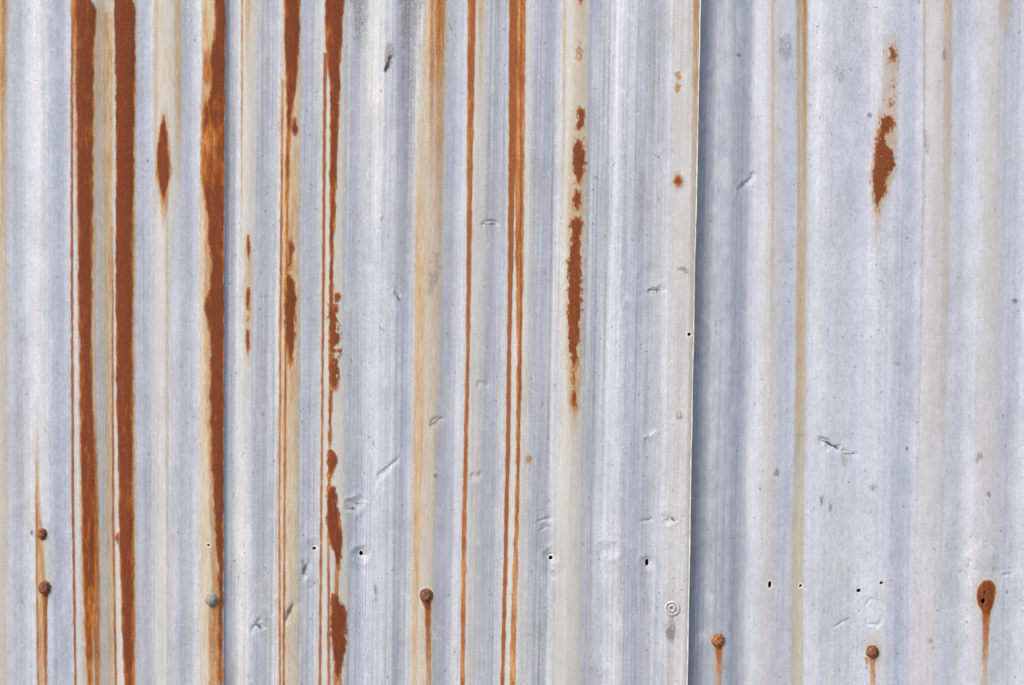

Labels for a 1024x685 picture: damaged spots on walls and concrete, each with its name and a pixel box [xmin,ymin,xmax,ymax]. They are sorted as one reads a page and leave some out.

rust [35,460,48,685]
rust [70,0,100,685]
rust [113,0,137,685]
rust [156,114,172,218]
rust [199,0,226,685]
rust [278,0,301,685]
rust [318,0,348,685]
rust [460,0,485,685]
rust [500,0,531,685]
rust [566,106,587,426]
rust [869,46,898,230]
rust [974,580,996,682]